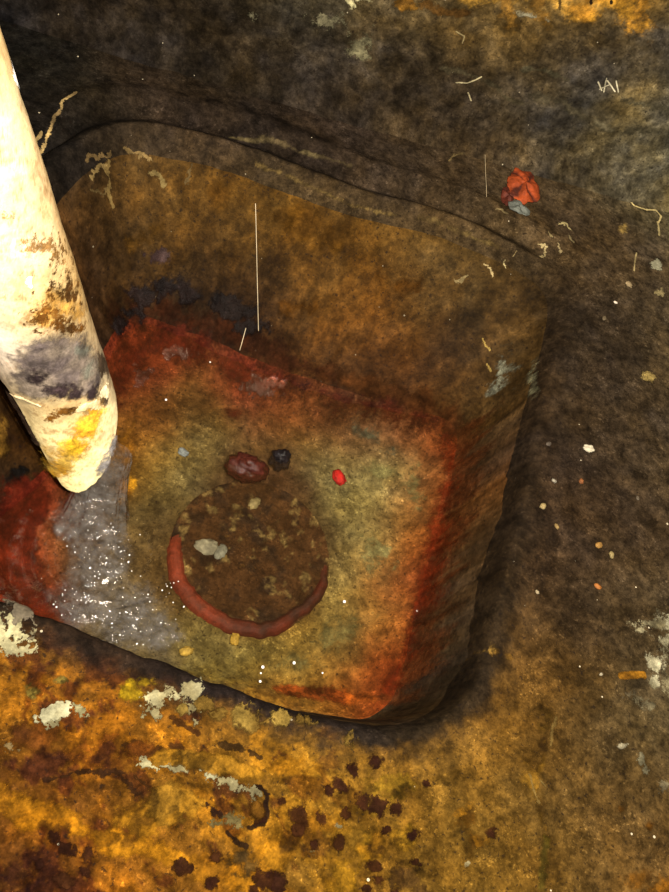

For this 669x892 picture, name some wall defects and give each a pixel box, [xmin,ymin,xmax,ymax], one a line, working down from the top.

rust [0,416,9,456]
rust [44,406,78,422]
leakage [95,437,117,476]
rust [0,475,56,618]
leakage [629,608,669,693]
leakage [119,678,149,700]
rust [11,722,306,783]
rust [0,753,431,892]